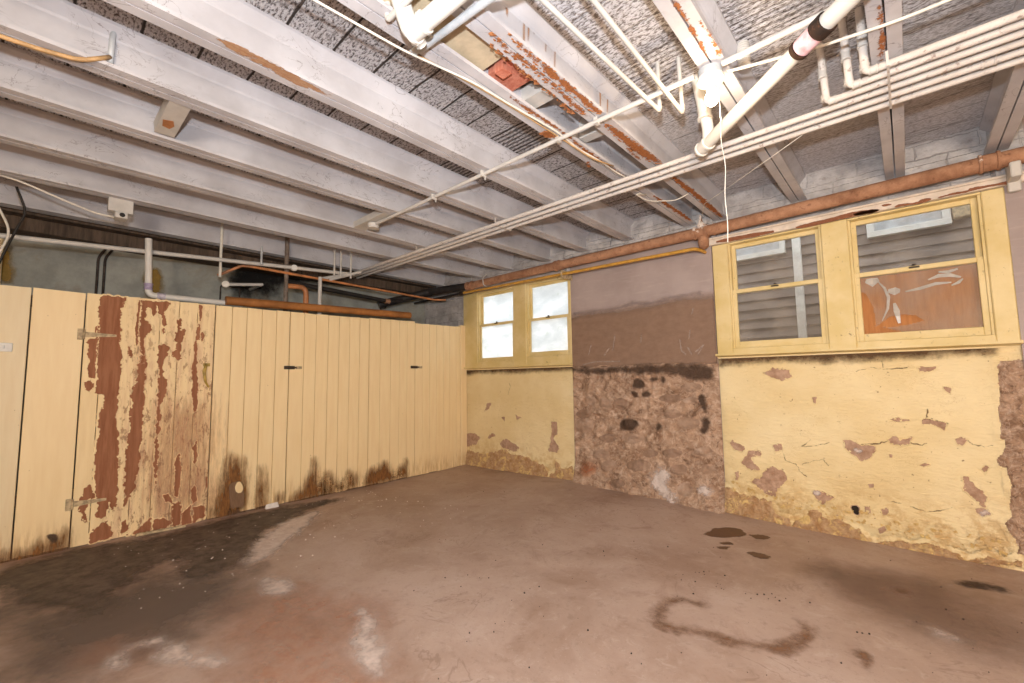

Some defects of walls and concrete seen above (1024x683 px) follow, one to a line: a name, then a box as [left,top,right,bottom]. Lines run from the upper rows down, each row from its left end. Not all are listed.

rust [672,0,722,55]
rust [217,39,325,94]
rust [488,25,662,175]
rust [653,196,692,221]
rust [672,176,723,217]
peeling [77,294,208,545]
spalling [466,353,1024,571]
water stain [705,527,770,549]
water stain [0,457,408,677]
water stain [704,628,811,654]